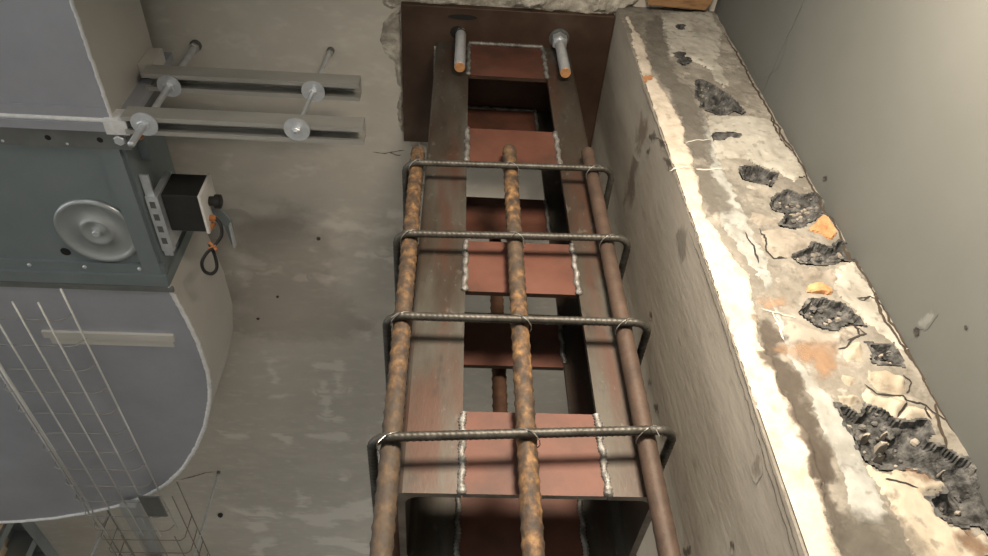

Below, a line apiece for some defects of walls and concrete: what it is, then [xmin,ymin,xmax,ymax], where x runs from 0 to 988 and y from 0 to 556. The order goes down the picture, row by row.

flaking render [380,0,988,556]
crack [724,34,954,446]